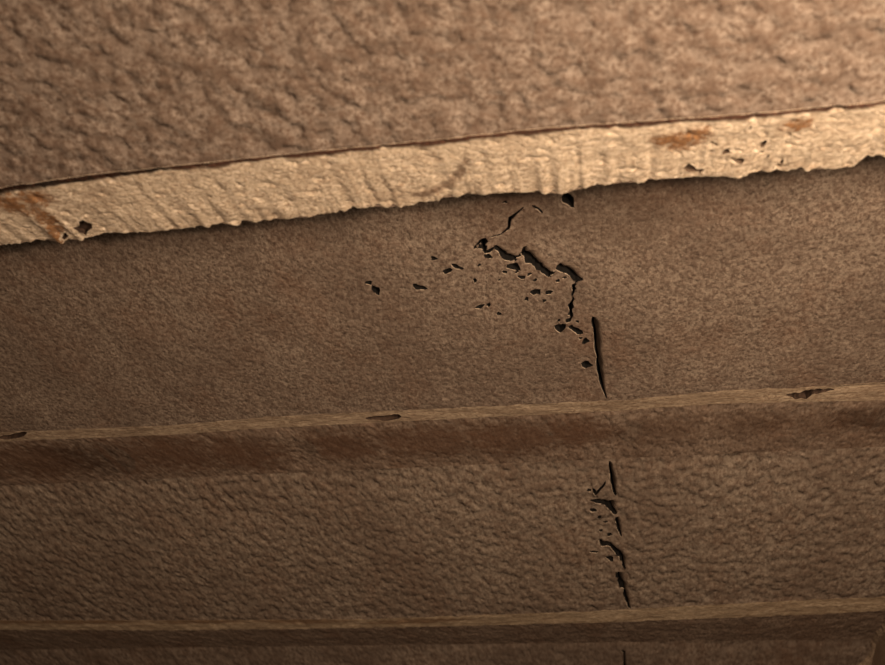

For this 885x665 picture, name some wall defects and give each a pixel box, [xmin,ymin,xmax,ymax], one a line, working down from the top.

rust [164,101,885,170]
rust [52,169,150,183]
spalling [0,100,885,245]
rust [0,184,68,244]
crack [365,281,380,296]
crack [413,282,427,290]
crack [430,193,607,399]
crack [587,461,631,609]
crack [620,650,628,665]